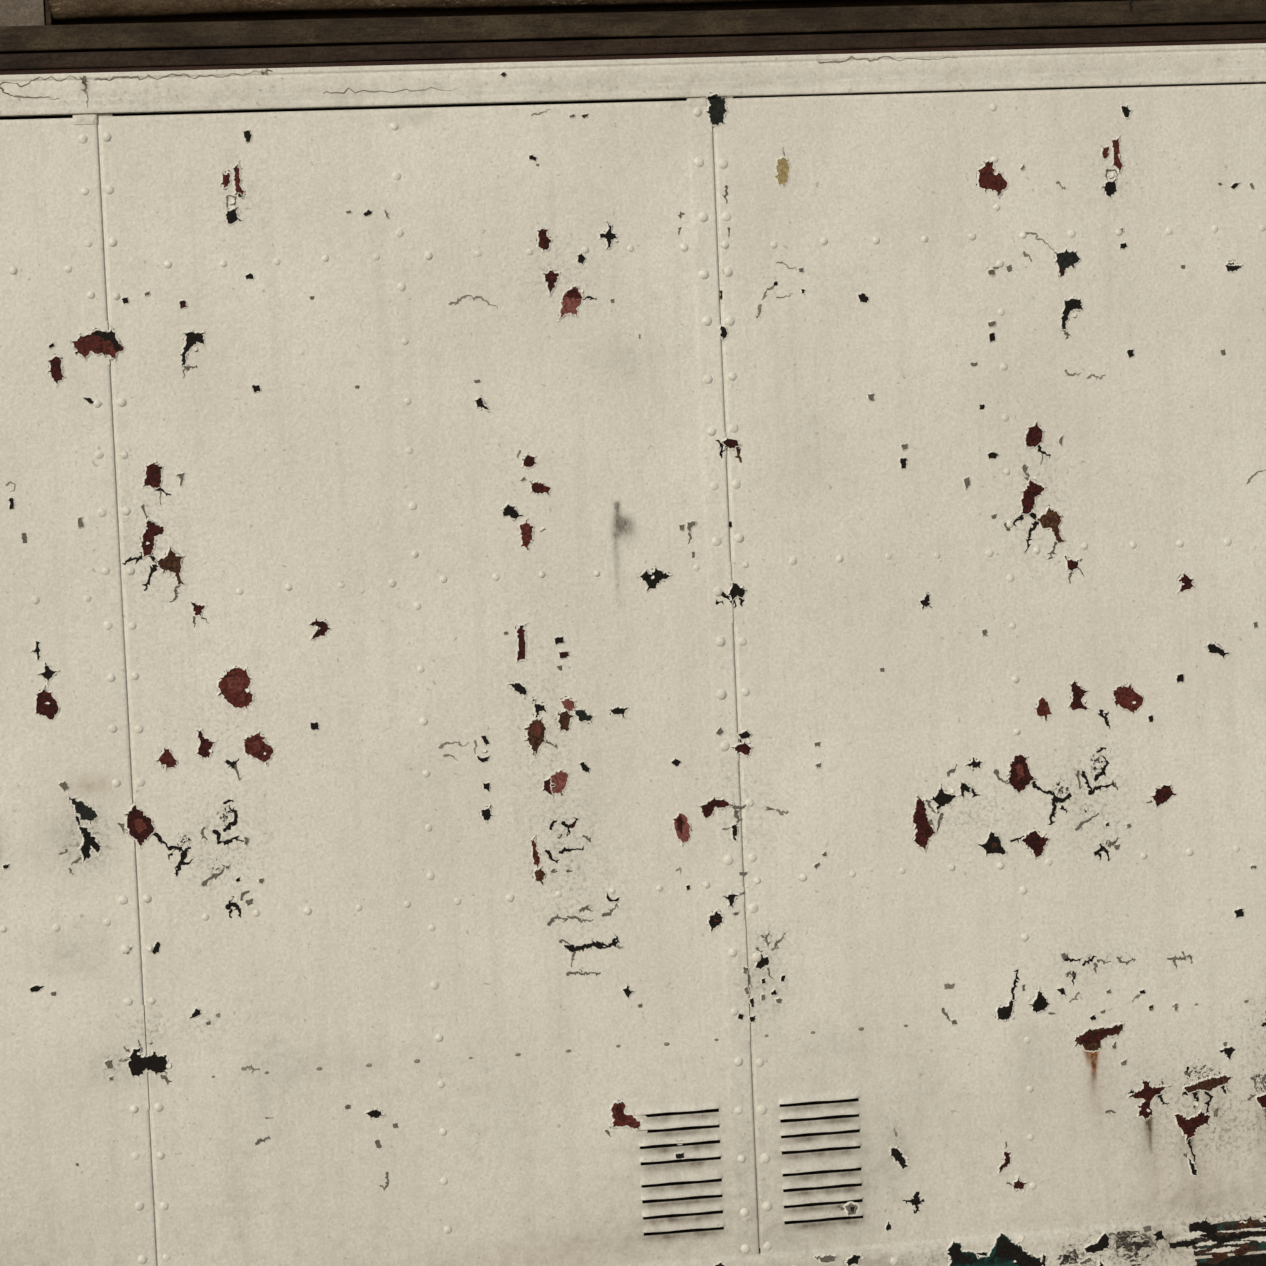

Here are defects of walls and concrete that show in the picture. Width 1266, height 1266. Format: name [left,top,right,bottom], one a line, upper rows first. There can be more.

peeling [530,217,625,325]
peeling [42,321,132,391]
peeling [122,456,213,627]
peeling [991,418,1087,583]
peeling [211,661,281,769]
peeling [1028,674,1154,724]
peeling [50,769,169,879]
peeling [905,747,1041,856]
crack [1032,709,1129,871]
crack [526,793,624,976]
corrosion [1062,947,1266,1266]
peeling [936,1224,1197,1266]